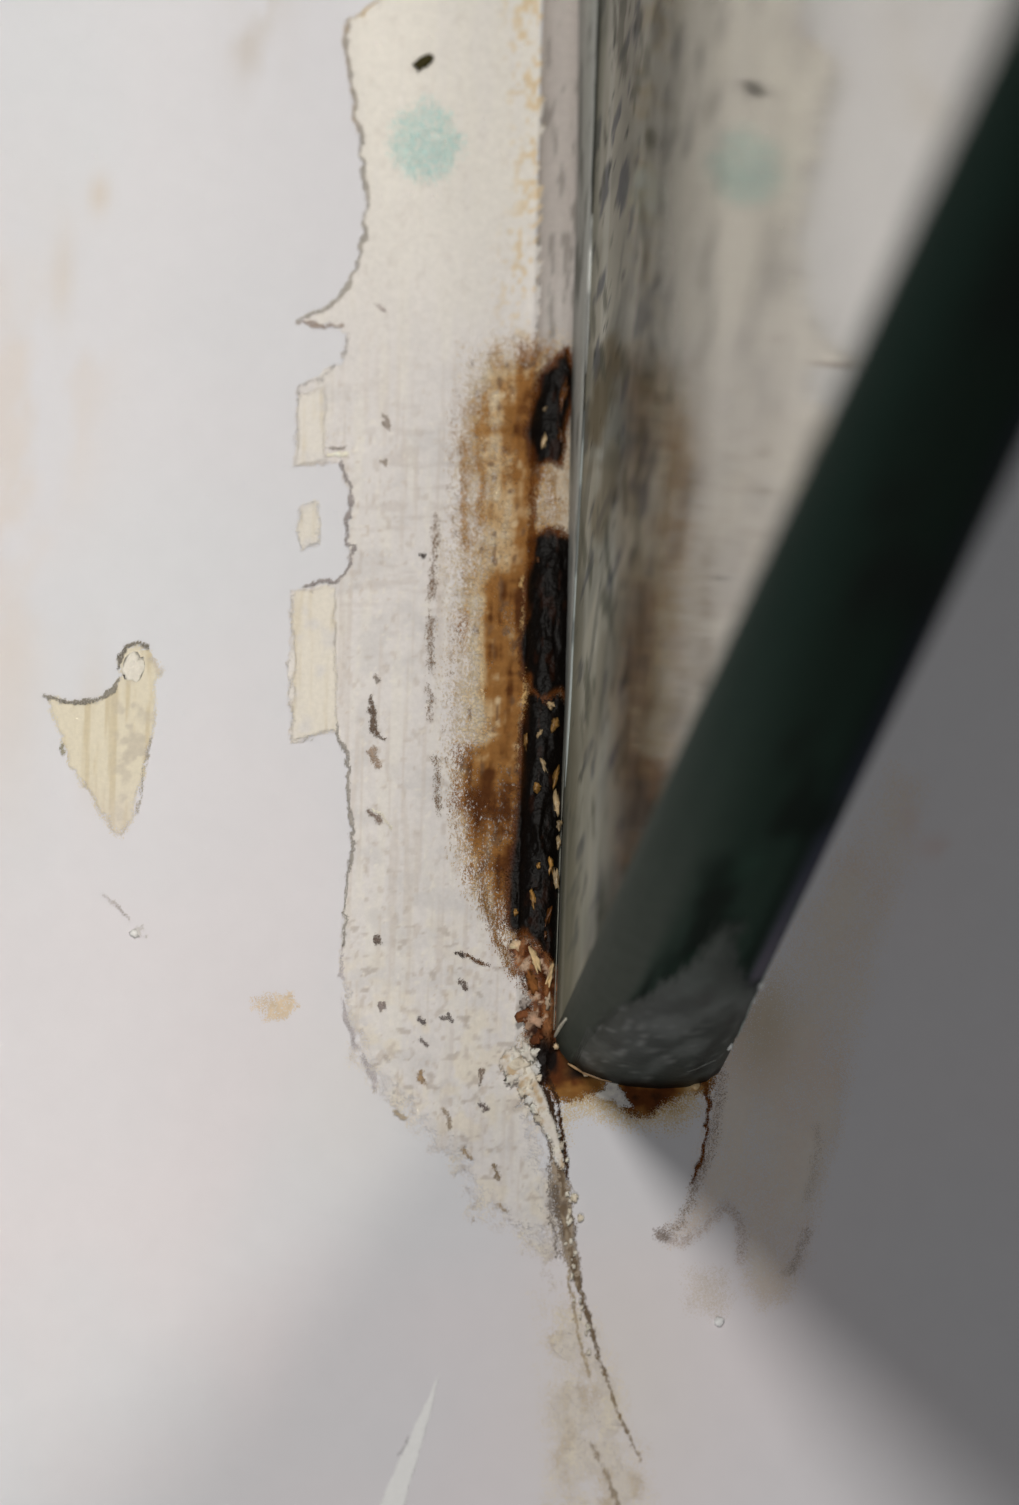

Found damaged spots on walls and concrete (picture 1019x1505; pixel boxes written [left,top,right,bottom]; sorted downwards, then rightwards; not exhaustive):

peeling [43,640,166,839]
peeling [285,0,565,1293]
corrosion [424,327,721,1186]
crack [539,1065,642,1505]